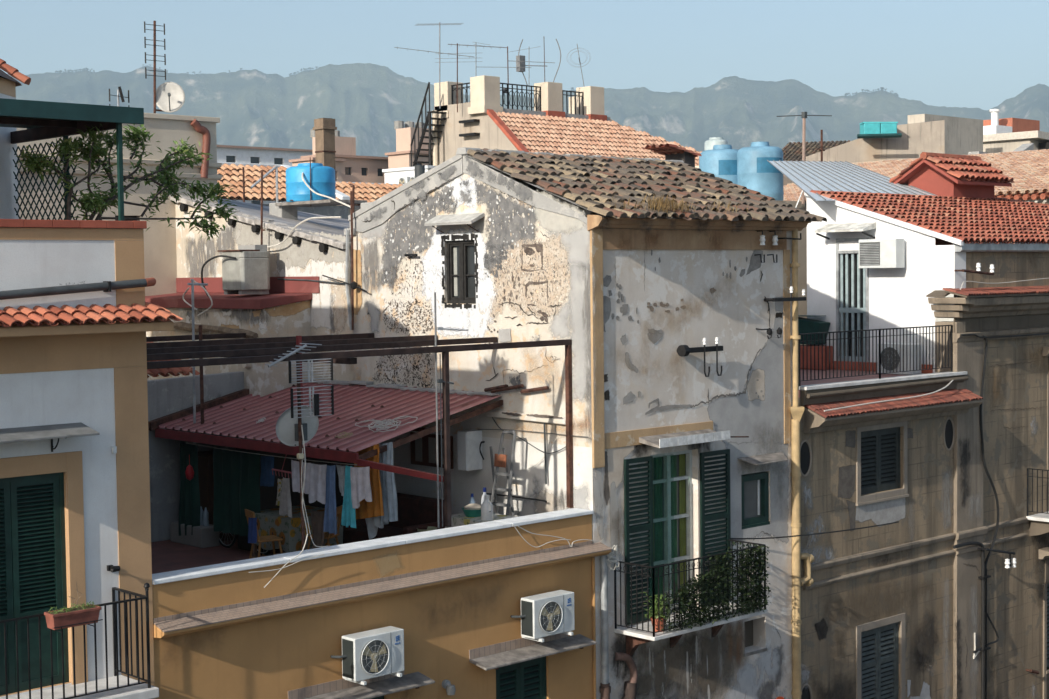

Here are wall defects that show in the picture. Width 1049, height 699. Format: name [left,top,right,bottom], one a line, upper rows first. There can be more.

peeling [381,166,570,344]
peeling [221,249,369,331]
crack [499,302,560,326]
spalling [603,275,686,344]
peeling [373,346,435,388]
crack [486,353,557,381]
spalling [621,334,638,373]
damp [914,592,977,699]
peeling [725,648,783,699]